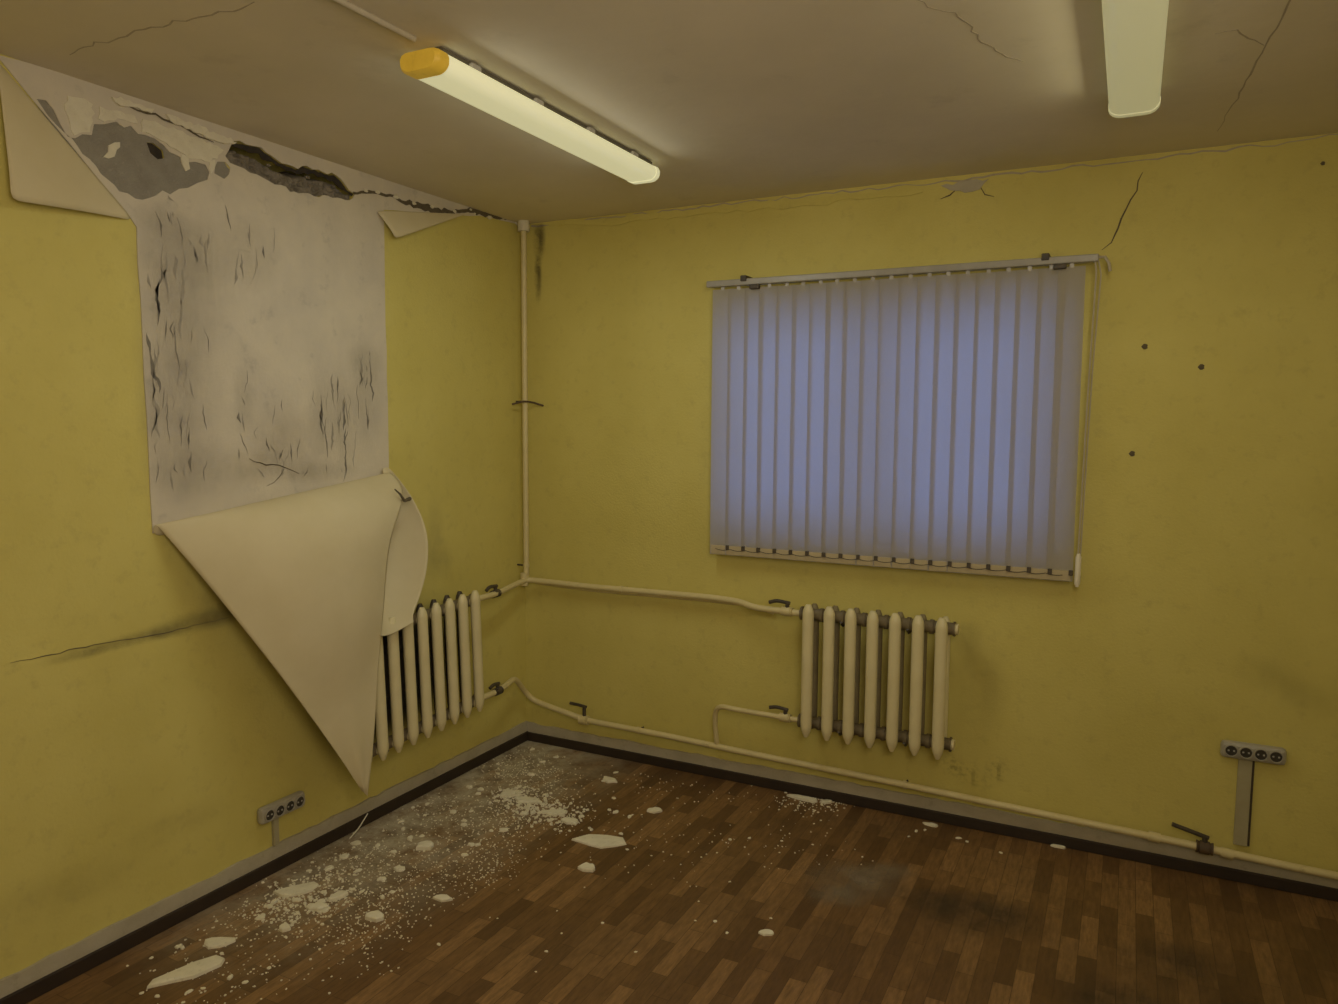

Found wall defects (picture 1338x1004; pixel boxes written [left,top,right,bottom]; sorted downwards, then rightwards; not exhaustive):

crack [131,107,214,143]
flaking render [0,56,515,533]
crack [353,188,547,227]
crack [585,0,1338,250]